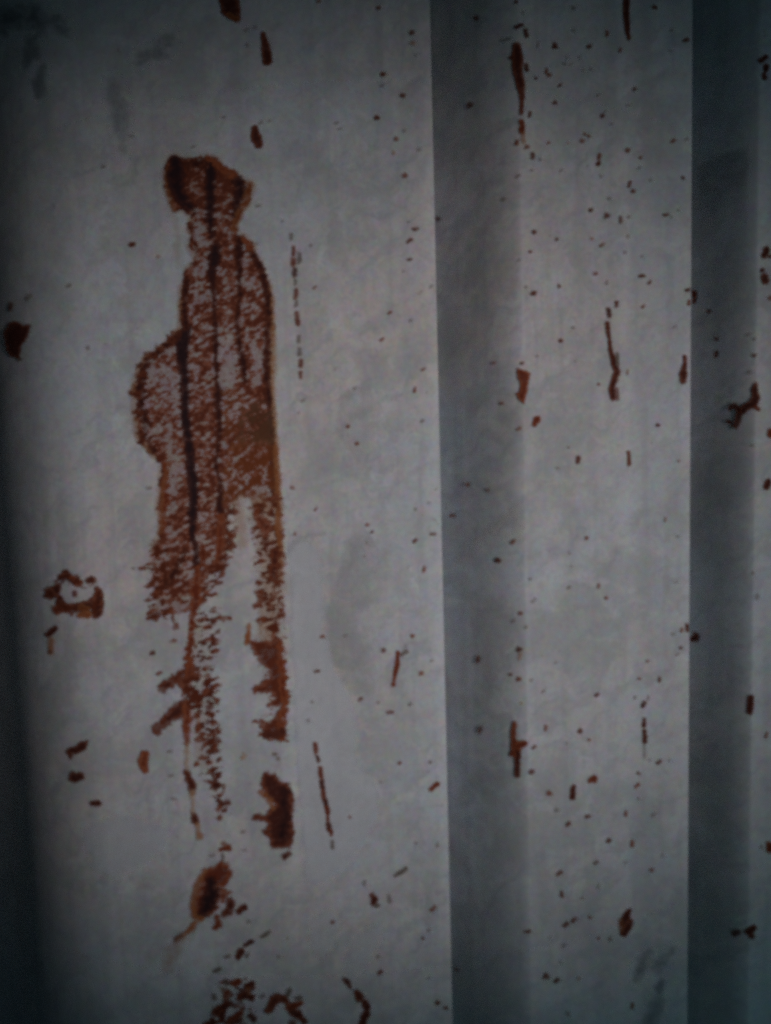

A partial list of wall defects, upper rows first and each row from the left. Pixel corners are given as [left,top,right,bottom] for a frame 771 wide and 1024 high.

corrosion [509,23,562,159]
corrosion [3,302,31,361]
corrosion [517,362,531,403]
corrosion [598,301,628,401]
corrosion [726,383,761,429]
corrosion [129,155,295,839]
corrosion [44,569,105,654]
corrosion [252,772,295,860]
corrosion [313,742,334,849]
corrosion [510,721,536,778]
corrosion [174,844,248,943]
corrosion [203,931,308,1024]